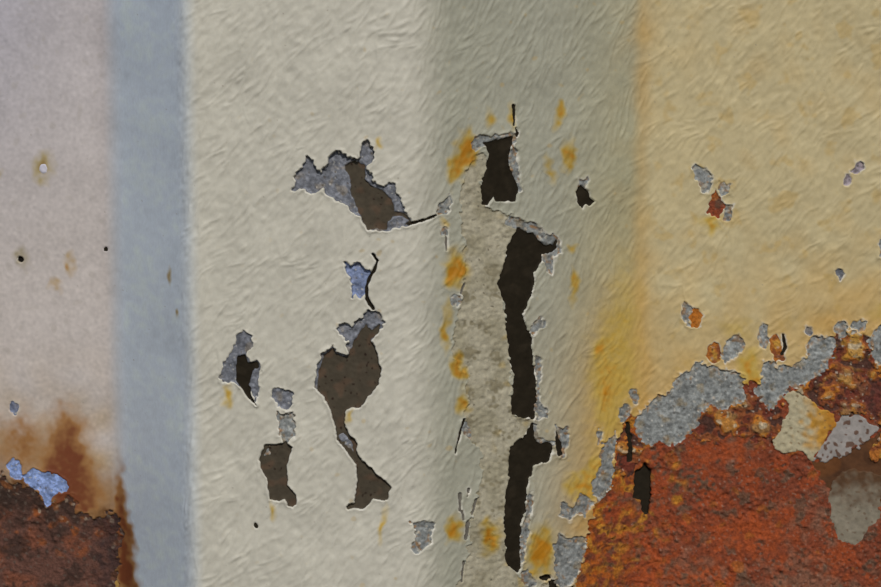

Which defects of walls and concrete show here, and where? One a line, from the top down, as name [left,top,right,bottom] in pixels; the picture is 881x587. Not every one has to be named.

corrosion [444,99,517,195]
corrosion [541,97,580,188]
peeling [576,177,594,208]
peeling [692,164,733,221]
corrosion [0,391,144,587]
peeling [218,330,261,405]
peeling [259,388,297,507]
peeling [291,140,569,587]
corrosion [438,236,475,420]
corrosion [443,510,506,561]
corrosion [520,243,881,587]
peeling [757,324,787,361]